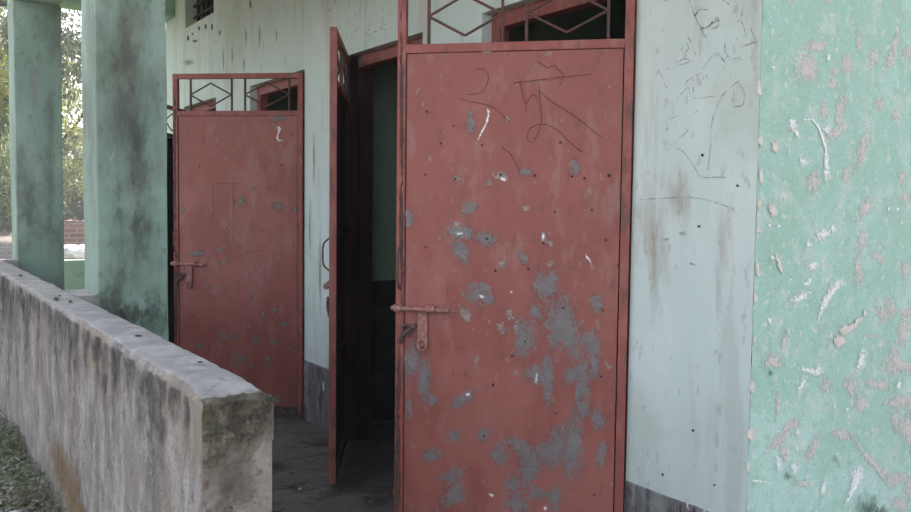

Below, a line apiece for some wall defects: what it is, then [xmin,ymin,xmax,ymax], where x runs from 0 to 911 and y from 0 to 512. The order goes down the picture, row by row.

peeling [791,30,911,144]
peeling [444,200,500,268]
peeling [459,282,494,324]
damp [0,275,188,443]
peeling [403,336,438,422]
peeling [476,262,608,512]
peeling [843,297,911,457]
peeling [436,464,472,508]
peeling [804,428,911,512]